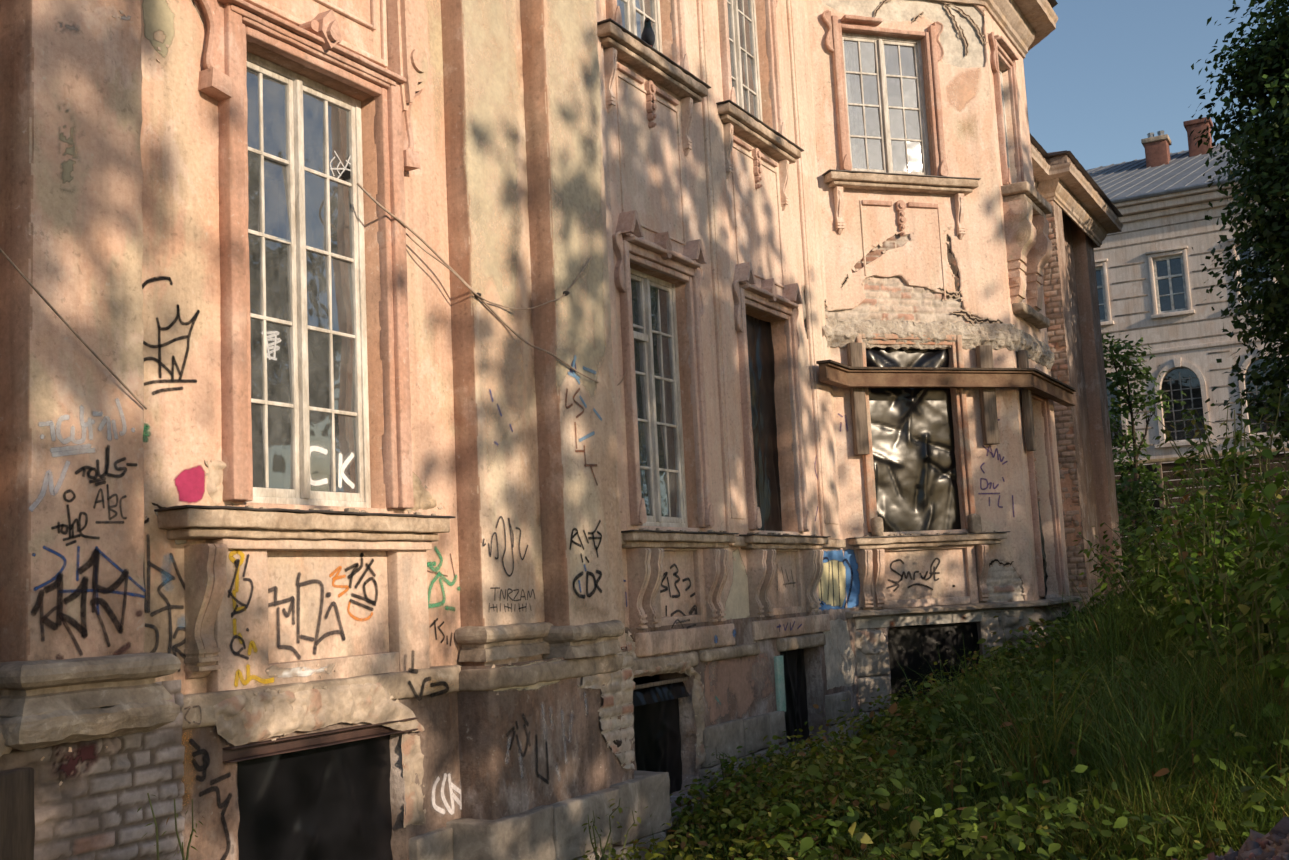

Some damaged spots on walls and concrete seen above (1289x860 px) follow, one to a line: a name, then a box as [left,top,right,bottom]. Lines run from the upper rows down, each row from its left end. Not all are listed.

peeling [112,0,175,63]
flaking render [821,0,989,111]
flaking render [825,232,982,324]
flaking render [577,627,706,769]